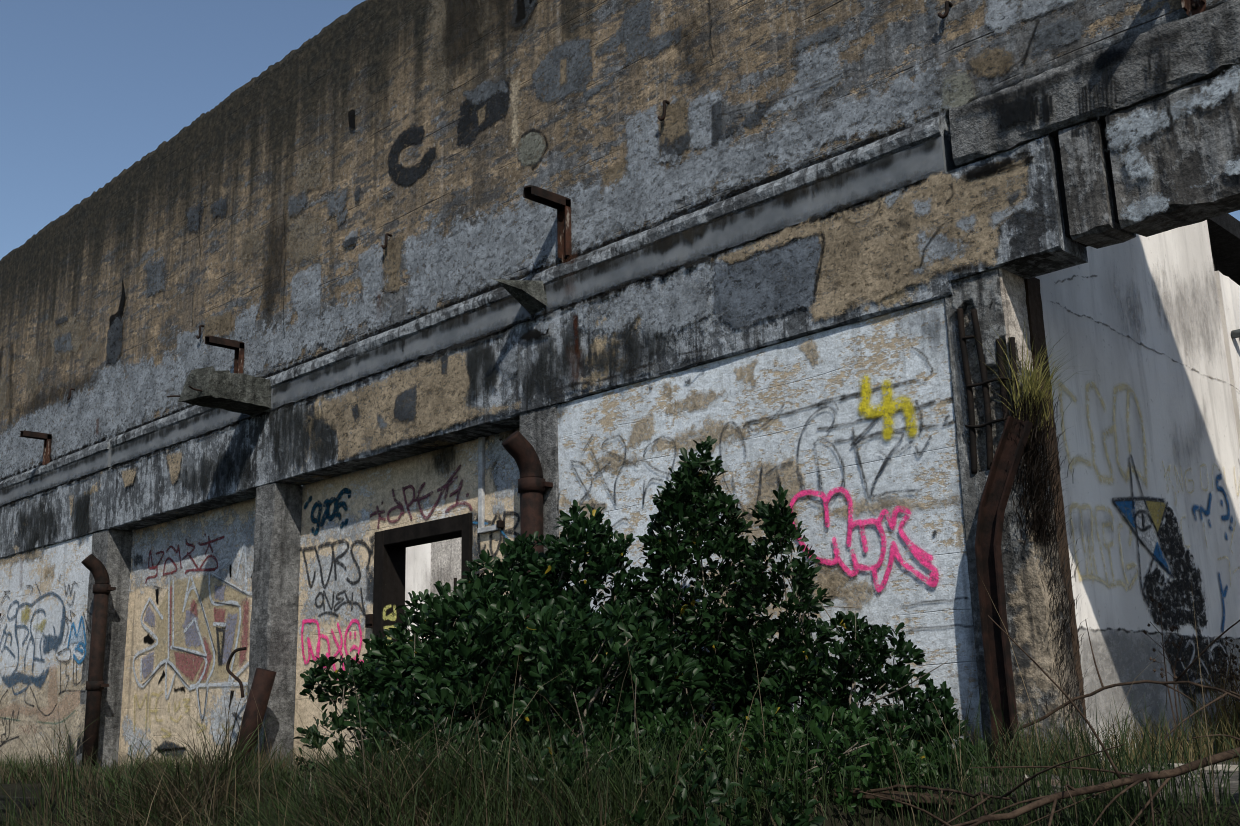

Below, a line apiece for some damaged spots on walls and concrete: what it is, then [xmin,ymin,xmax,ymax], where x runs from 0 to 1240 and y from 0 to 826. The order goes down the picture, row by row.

leakage [776,136,936,203]
peeling [0,0,1083,485]
leakage [541,207,788,311]
leakage [517,321,667,416]
crack [1052,275,1237,389]
peeling [0,331,521,518]
peeling [128,505,255,604]
peeling [297,503,375,641]
peeling [565,494,607,520]
peeling [726,458,805,538]
peeling [812,562,874,613]
peeling [820,495,957,518]